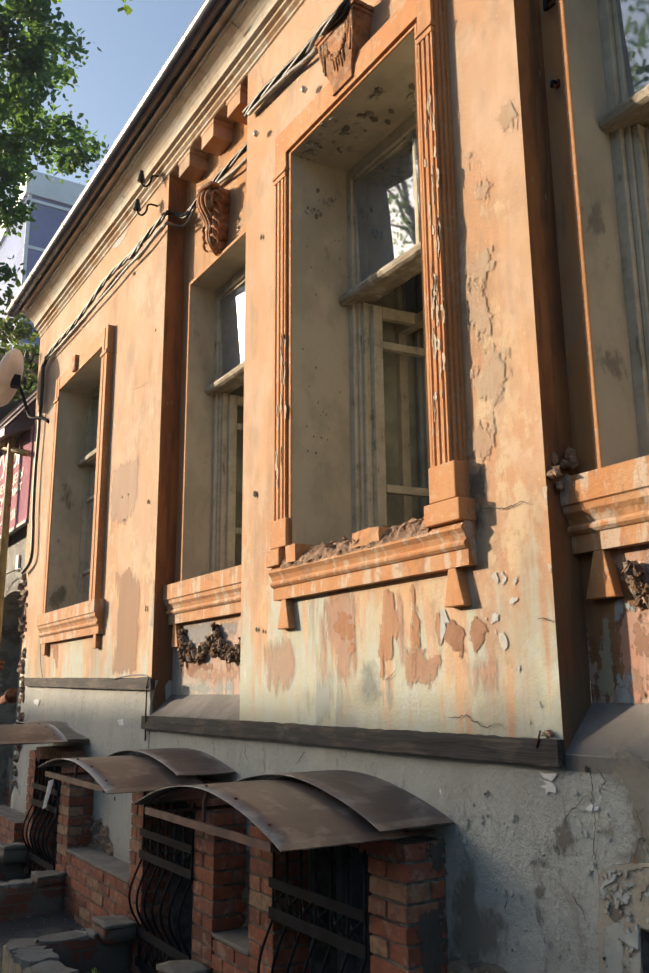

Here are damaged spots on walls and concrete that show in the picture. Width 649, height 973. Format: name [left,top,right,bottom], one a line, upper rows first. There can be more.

peeling [301,87,395,163]
peeling [407,83,446,378]
peeling [440,609,449,644]
peeling [485,612,508,651]
peeling [596,599,636,705]
crack [449,714,506,730]
crack [565,769,649,887]
water stain [416,872,503,973]
flaking render [598,863,649,973]